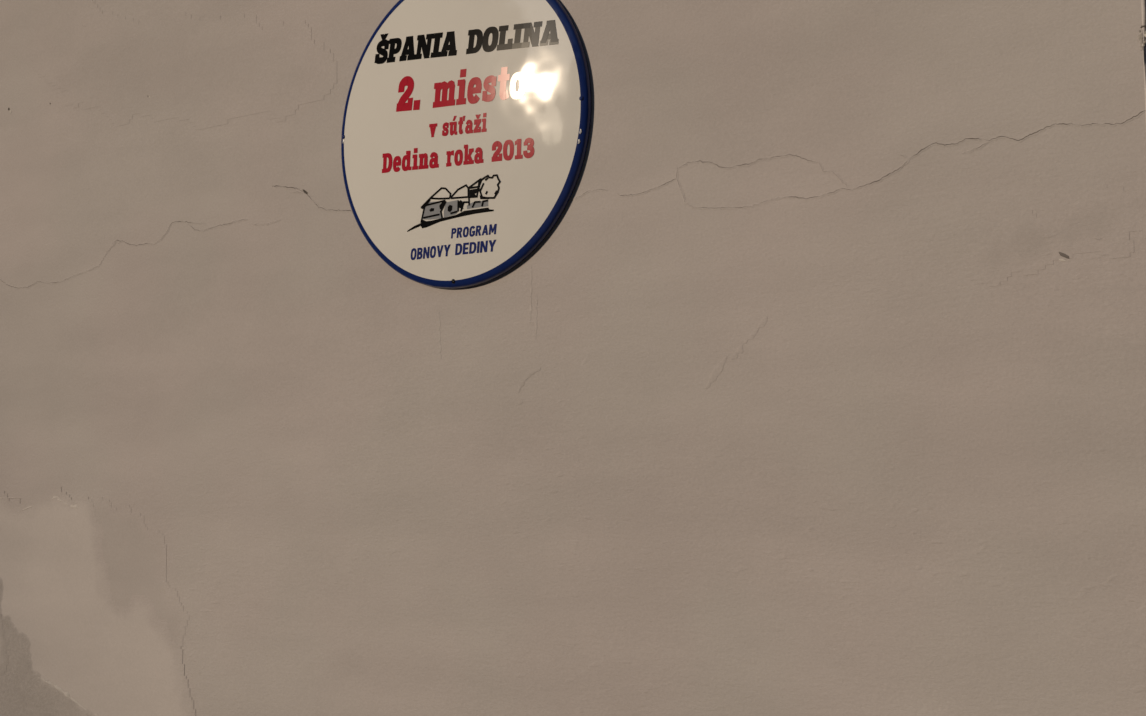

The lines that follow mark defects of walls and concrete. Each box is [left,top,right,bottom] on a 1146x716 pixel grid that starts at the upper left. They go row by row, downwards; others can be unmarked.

crack [569,109,1146,211]
crack [272,184,352,212]
crack [0,218,281,289]